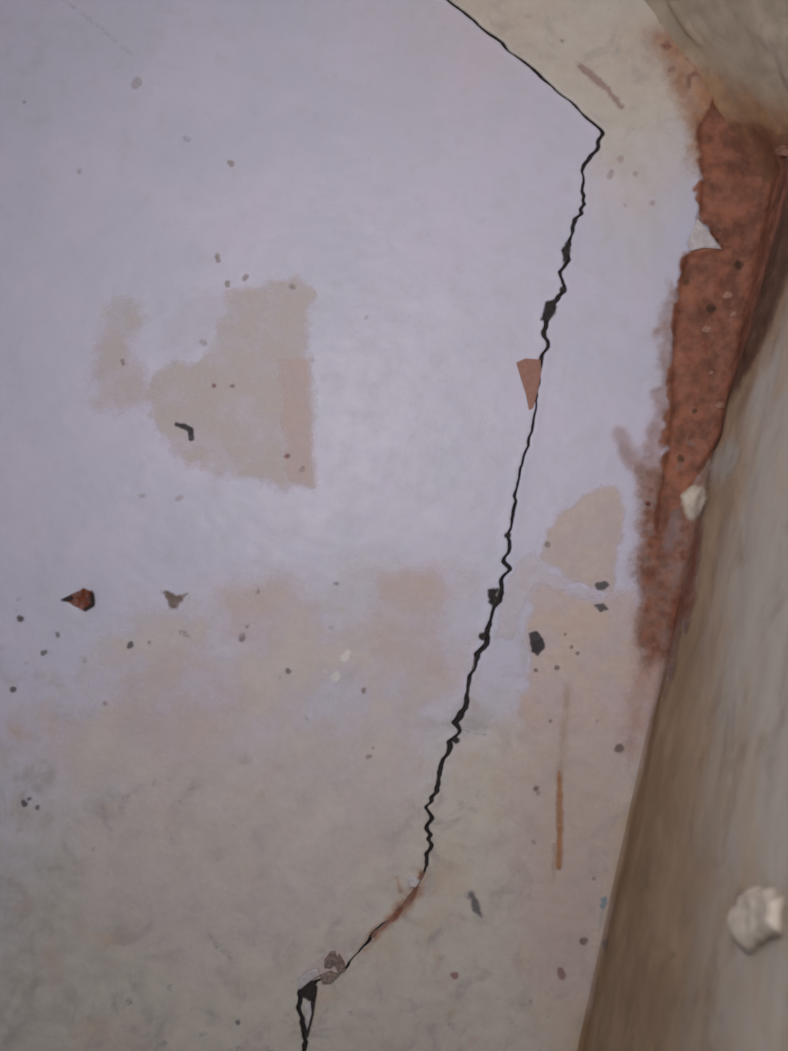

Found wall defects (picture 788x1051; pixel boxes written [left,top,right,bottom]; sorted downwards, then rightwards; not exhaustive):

peeling [94,278,316,488]
crack [406,0,605,899]
spalling [651,100,788,537]
corrosion [553,765,563,870]
crack [296,978,321,1051]
crack [345,920,387,969]